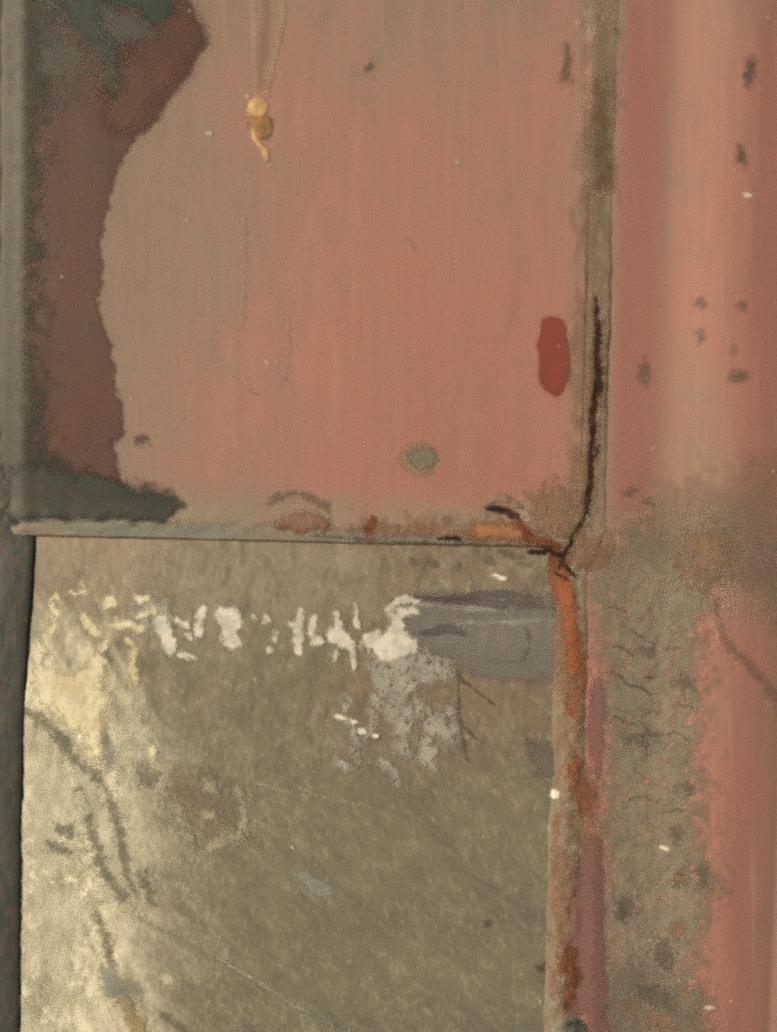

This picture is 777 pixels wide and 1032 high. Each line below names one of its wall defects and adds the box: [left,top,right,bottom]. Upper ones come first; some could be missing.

corrosion [247,0,285,161]
water stain [14,0,208,486]
crack [437,534,461,542]
corrosion [350,516,587,745]
crack [526,296,603,580]
peeling [20,573,557,1032]
corrosion [547,756,602,1020]